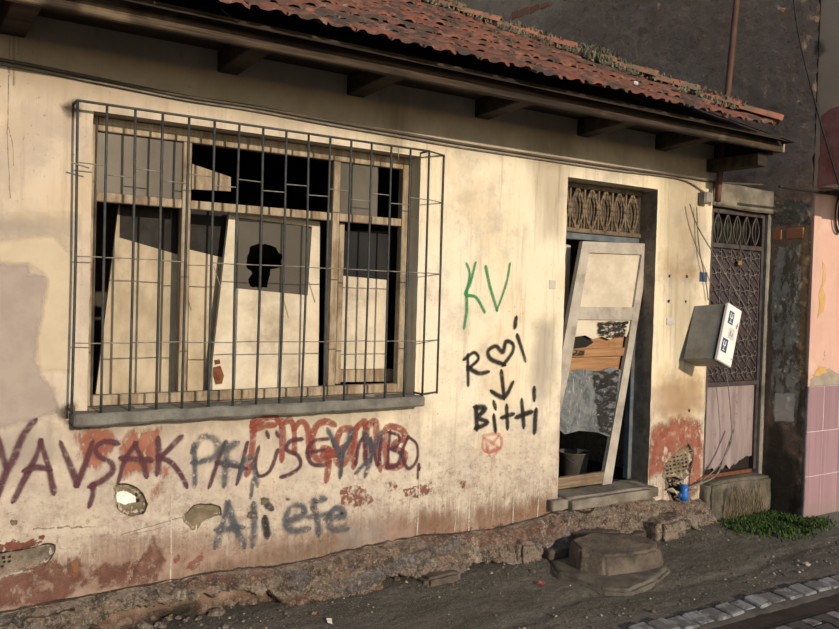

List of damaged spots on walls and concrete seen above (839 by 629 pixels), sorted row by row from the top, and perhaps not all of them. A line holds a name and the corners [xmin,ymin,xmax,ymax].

peeling [817,262,826,318]
peeling [770,227,804,426]
peeling [810,366,839,386]
peeling [78,428,169,517]
peeling [649,417,704,501]
flaking render [183,503,222,530]
peeling [0,535,180,607]